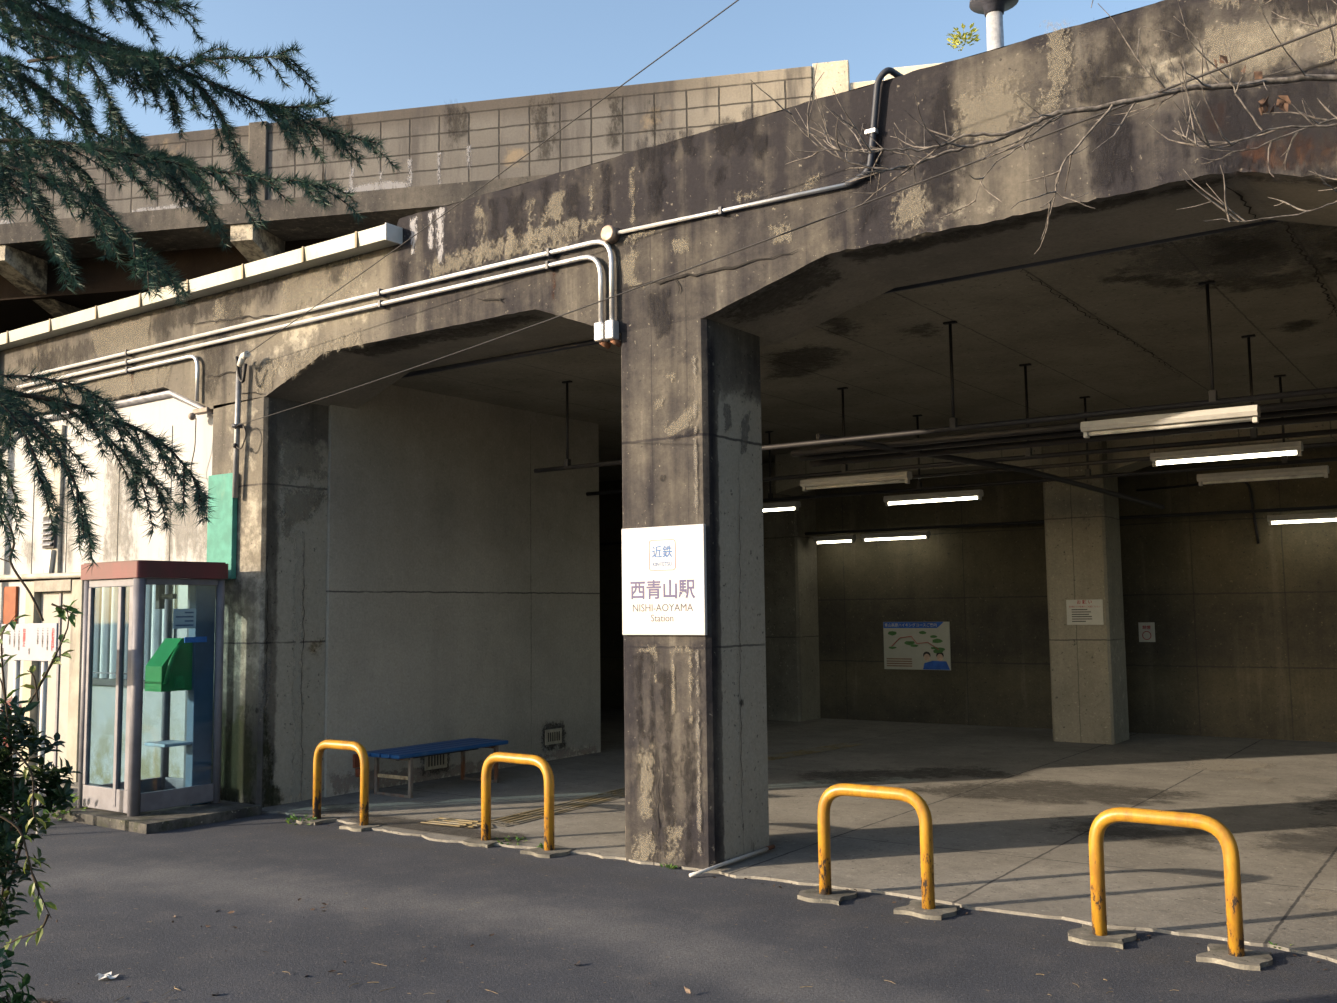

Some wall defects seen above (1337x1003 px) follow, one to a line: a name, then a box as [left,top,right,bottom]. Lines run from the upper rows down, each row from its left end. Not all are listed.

water stain [1263,0,1337,27]
water stain [132,204,188,212]
water stain [326,119,412,192]
water stain [399,164,610,285]
water stain [629,116,697,220]
water stain [711,105,766,183]
water stain [858,123,882,226]
water stain [923,82,973,214]
water stain [1057,10,1337,213]